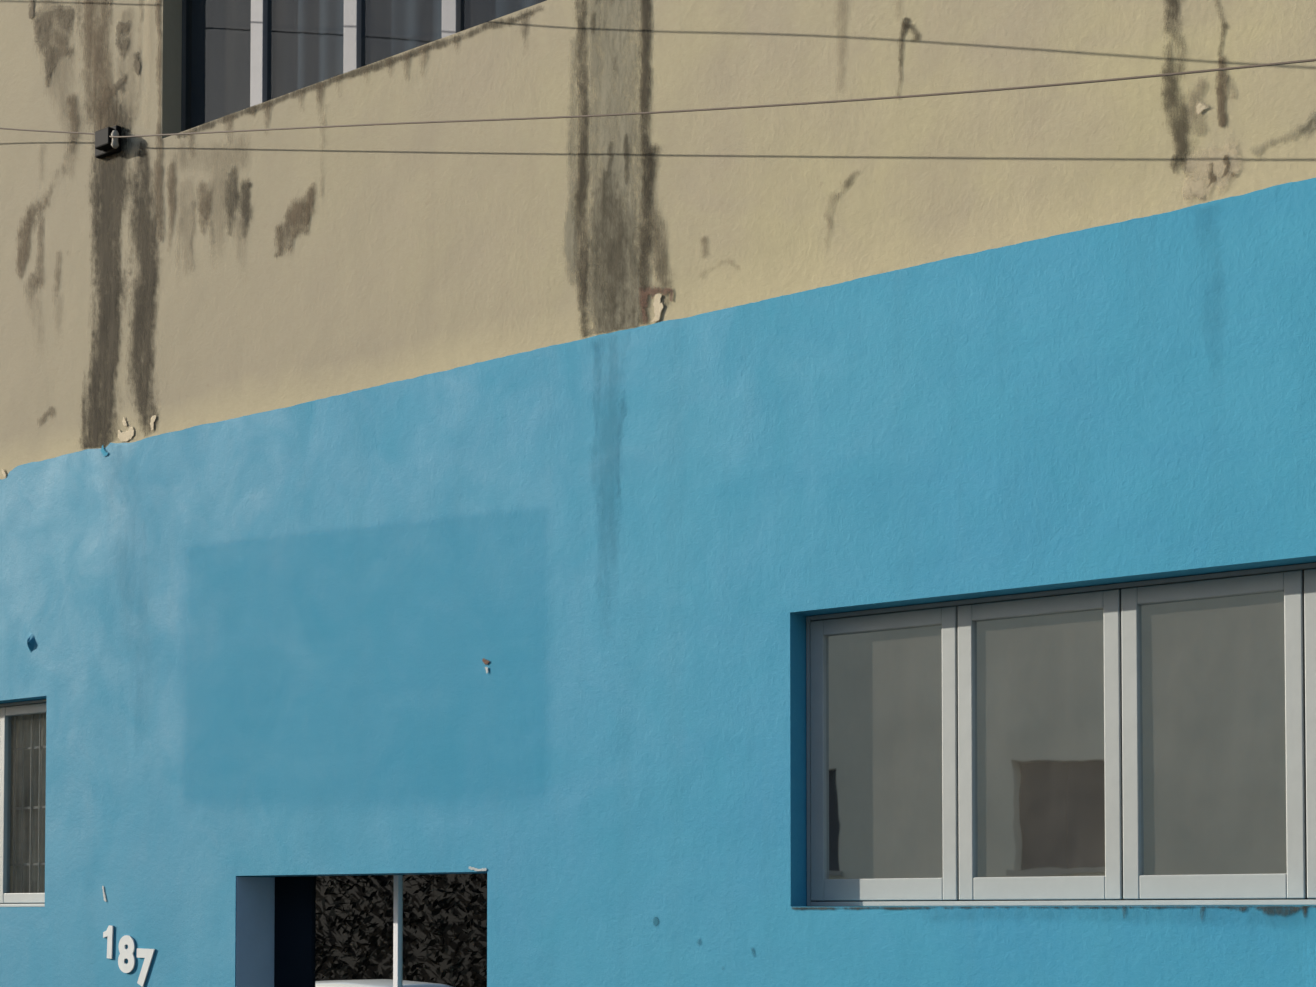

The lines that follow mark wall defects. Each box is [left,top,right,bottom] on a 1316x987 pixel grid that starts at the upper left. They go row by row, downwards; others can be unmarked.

damp [177,10,534,144]
damp [1162,0,1203,173]
damp [16,199,59,284]
damp [77,0,176,449]
damp [198,169,251,233]
damp [274,187,314,254]
damp [564,0,666,336]
peeling [640,287,673,324]
peeling [118,417,134,442]